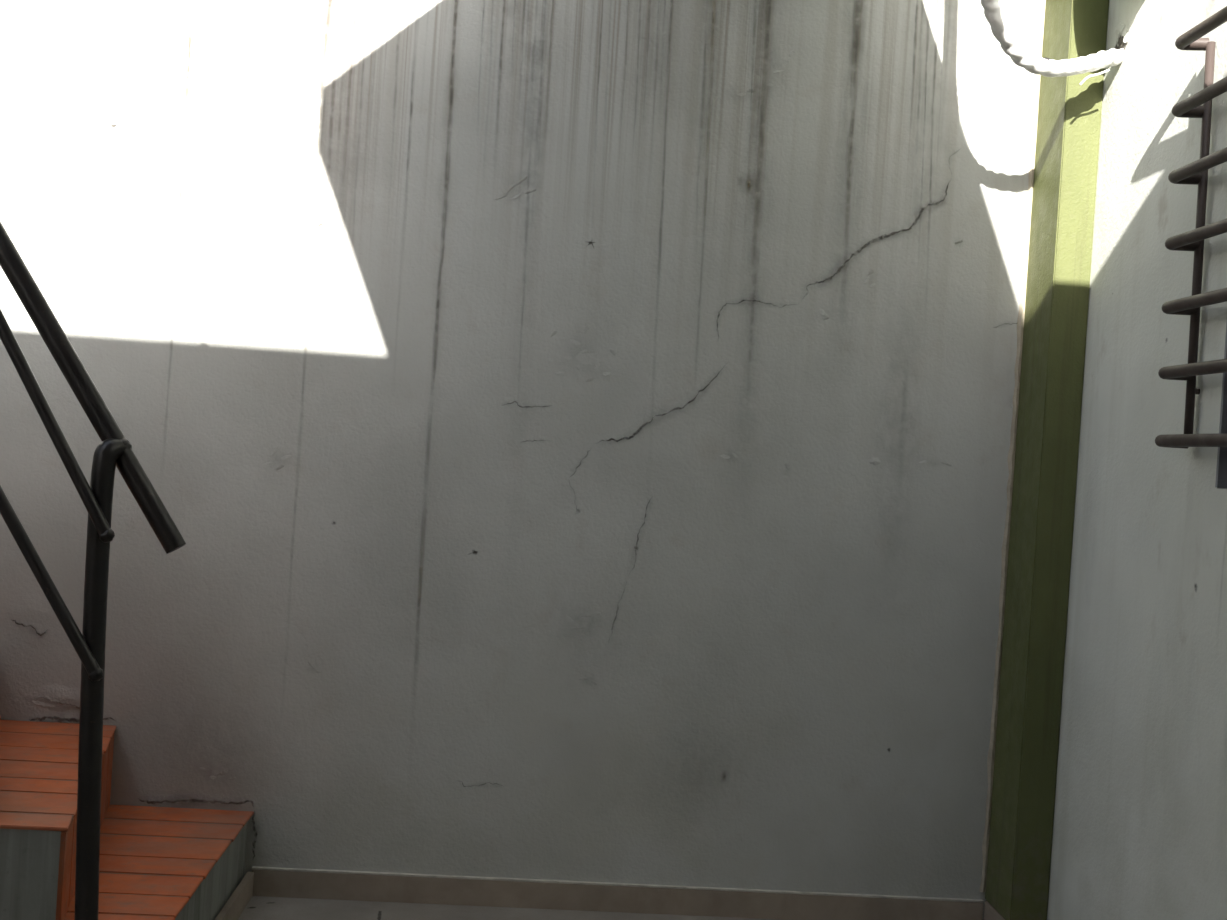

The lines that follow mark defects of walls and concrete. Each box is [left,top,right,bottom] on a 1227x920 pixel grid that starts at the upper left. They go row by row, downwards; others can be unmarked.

crack [592,177,951,444]